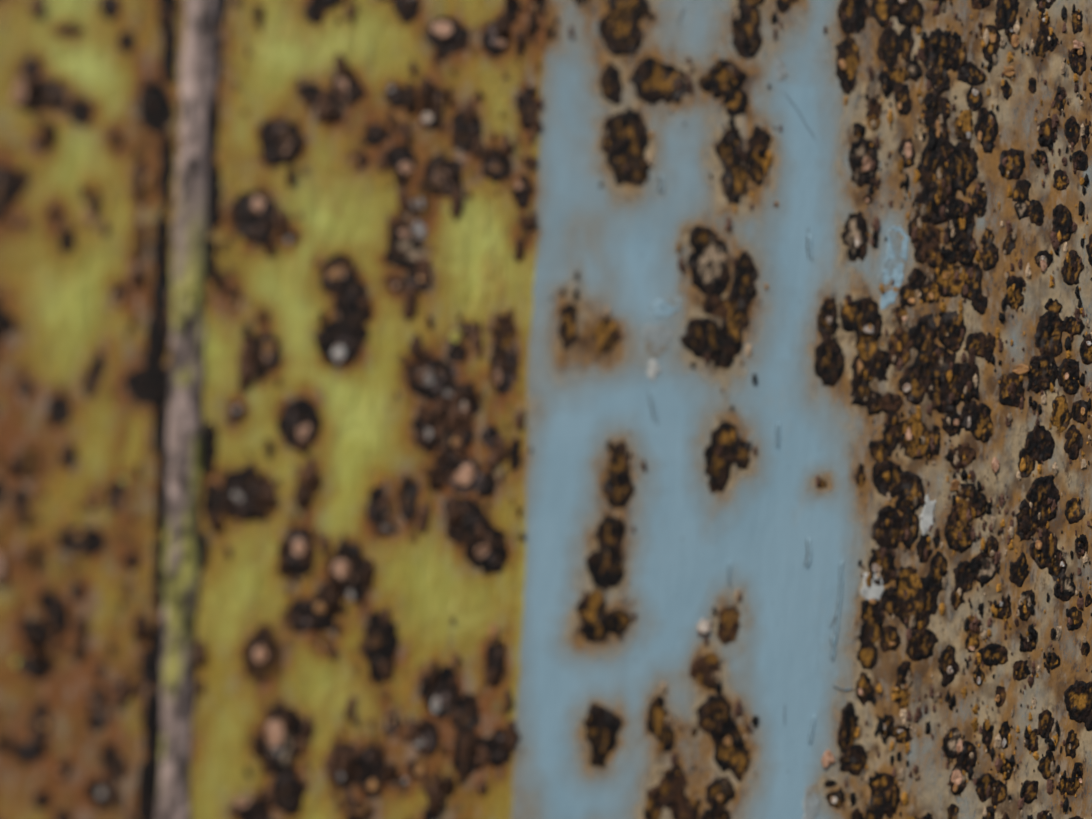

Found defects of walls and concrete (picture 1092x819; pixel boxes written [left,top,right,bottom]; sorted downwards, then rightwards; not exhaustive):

rust [807,0,1092,819]